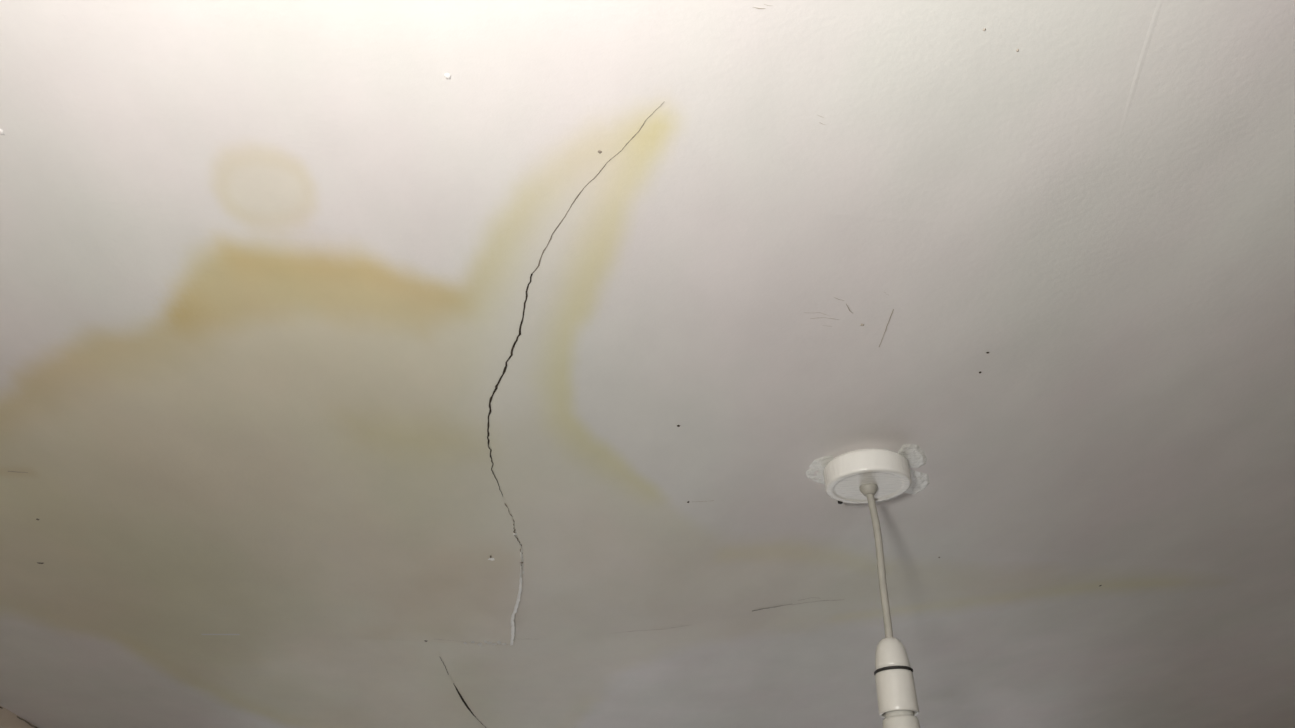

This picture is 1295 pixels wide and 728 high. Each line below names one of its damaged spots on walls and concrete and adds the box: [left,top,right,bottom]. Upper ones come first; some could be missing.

leakage [0,77,884,728]
crack [440,658,486,728]
crack [487,102,664,646]
leakage [883,550,1239,623]